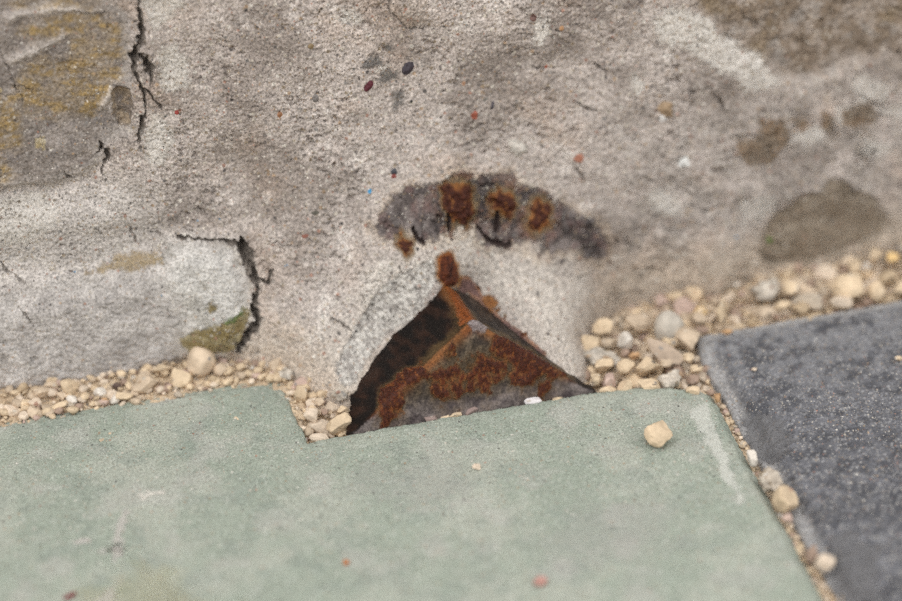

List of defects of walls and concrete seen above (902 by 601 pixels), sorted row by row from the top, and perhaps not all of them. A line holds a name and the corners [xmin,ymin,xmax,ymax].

crack [128,0,162,143]
crack [97,140,111,173]
rust [371,170,609,264]
crack [176,235,274,354]
rust [378,276,567,429]